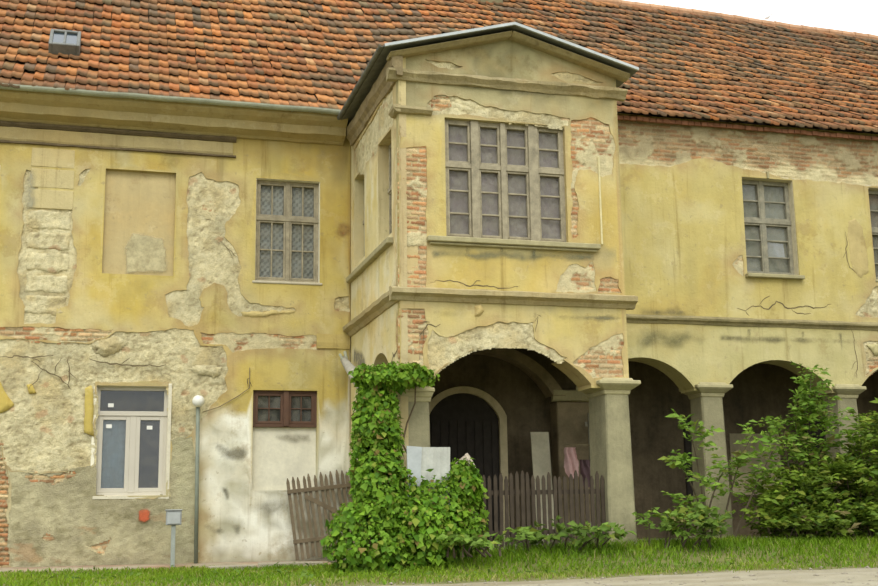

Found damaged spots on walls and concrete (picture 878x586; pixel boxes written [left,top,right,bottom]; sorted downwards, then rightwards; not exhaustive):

flaking render [355,90,427,287]
flaking render [427,95,878,239]
crack [438,280,518,289]
flaking render [556,262,621,293]
crack [738,296,829,315]
flaking render [0,170,320,567]
flaking render [398,307,624,378]
flaking render [863,341,878,376]